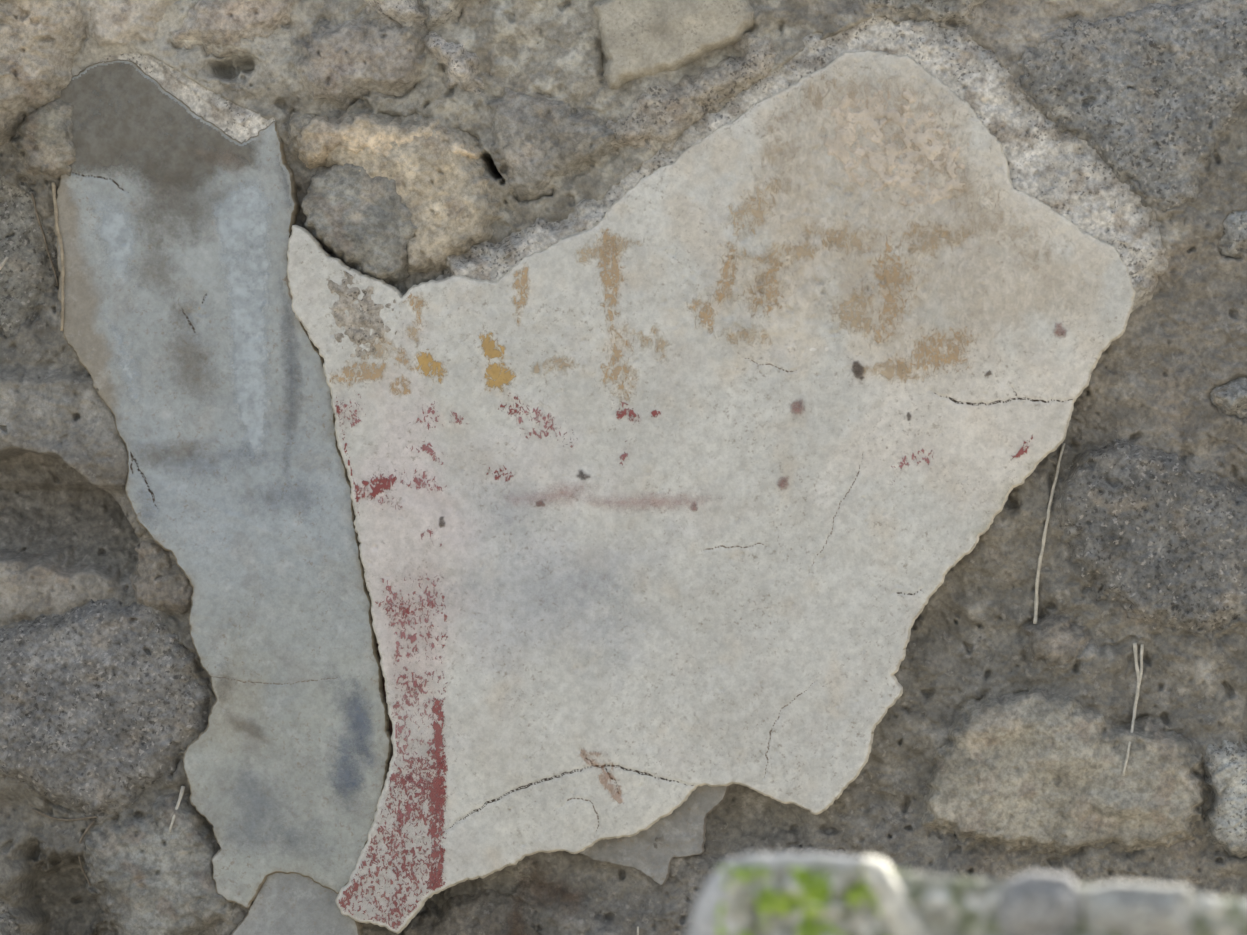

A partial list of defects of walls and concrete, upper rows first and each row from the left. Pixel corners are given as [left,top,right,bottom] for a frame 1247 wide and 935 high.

crack [935,389,1073,406]
peeling [891,449,933,469]
crack [813,452,864,564]
crack [449,754,694,831]